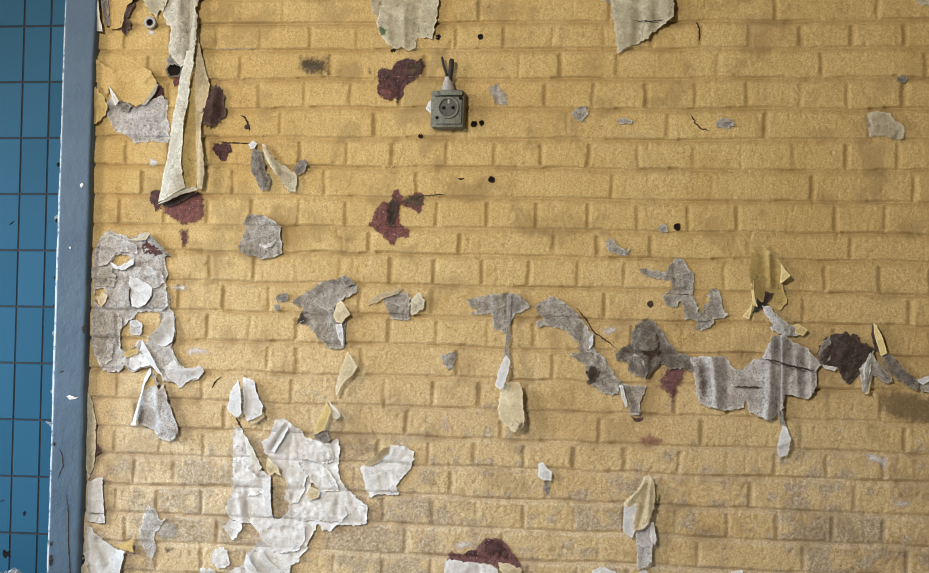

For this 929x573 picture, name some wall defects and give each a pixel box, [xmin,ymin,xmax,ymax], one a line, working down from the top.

peeling [369,0,439,103]
peeling [601,0,675,54]
peeling [94,0,232,247]
peeling [248,140,307,192]
peeling [238,214,282,260]
spalling [369,189,444,245]
peeling [82,231,204,441]
peeling [368,285,425,321]
peeling [467,244,929,457]
peeling [200,275,415,573]
flaking render [444,537,522,573]
peeling [623,475,659,573]